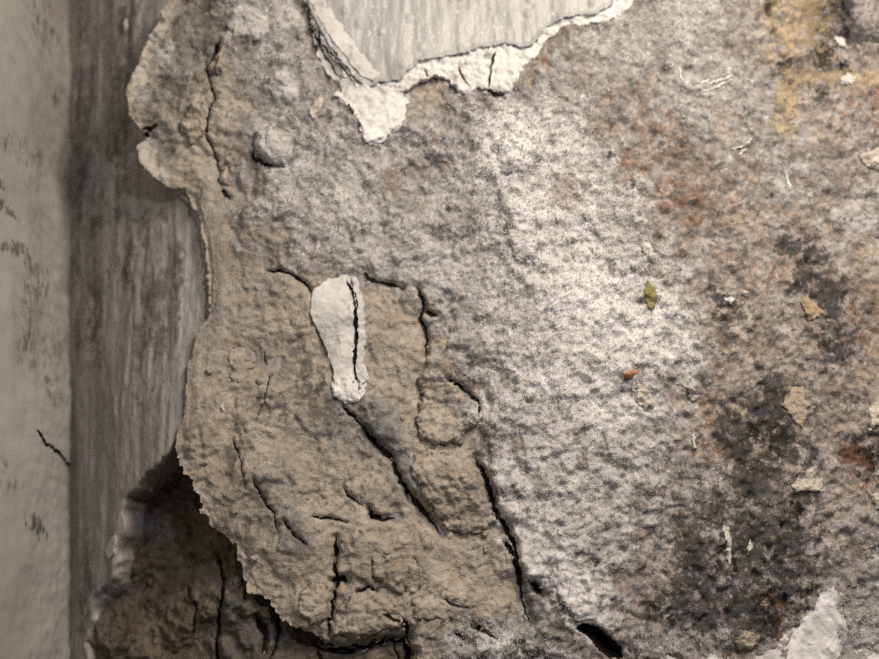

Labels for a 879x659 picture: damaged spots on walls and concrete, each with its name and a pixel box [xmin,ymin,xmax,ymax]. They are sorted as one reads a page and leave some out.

leakage [115,6,135,90]
crack [205,41,231,199]
leakage [840,0,879,50]
flaking render [88,0,539,659]
crack [364,272,437,355]
leakage [149,0,838,659]
flaking render [282,0,879,659]
leakage [773,233,852,365]
crack [314,516,414,659]
crack [343,407,441,535]
crack [475,457,541,620]
leakage [724,496,879,659]